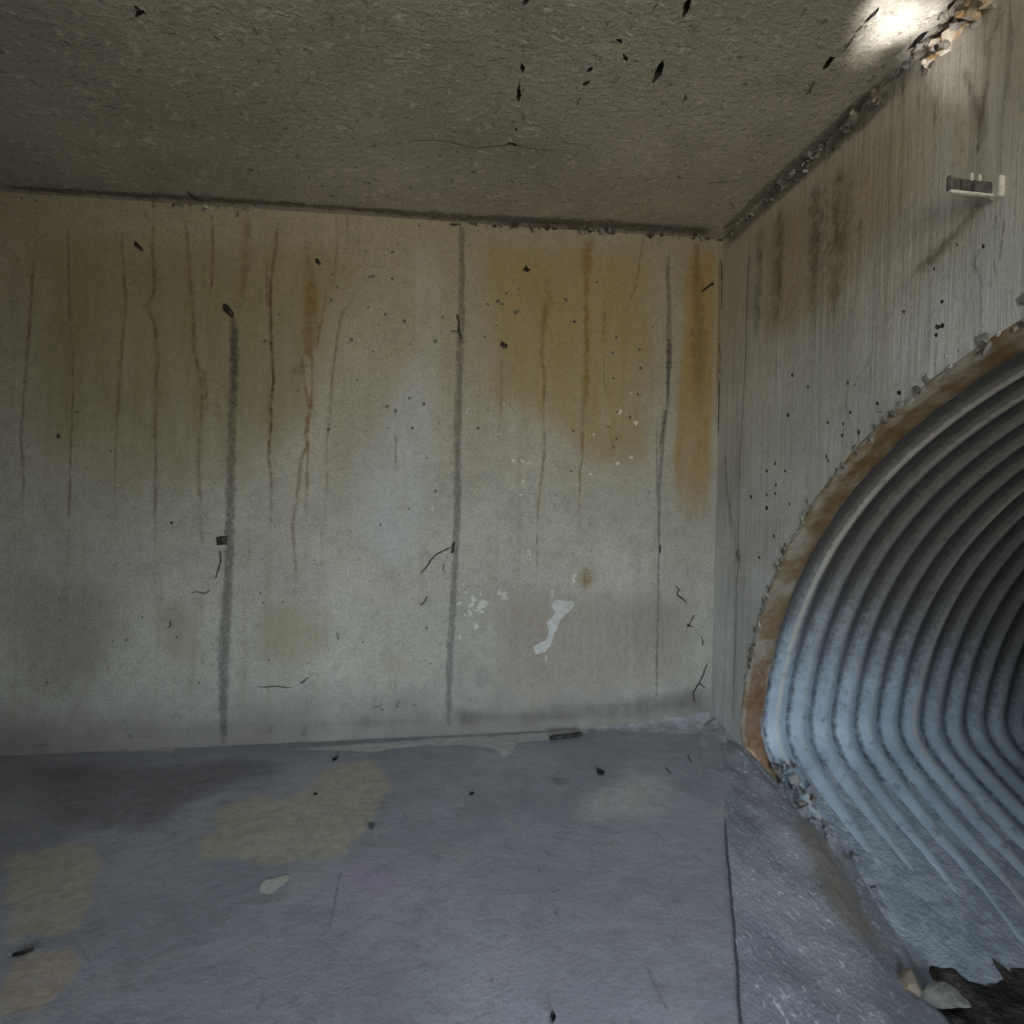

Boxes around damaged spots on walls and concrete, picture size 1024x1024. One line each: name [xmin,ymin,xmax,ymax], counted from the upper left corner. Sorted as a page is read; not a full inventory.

spalling [678,0,996,241]
water stain [0,202,457,683]
corrosion [463,222,721,526]
crack [422,542,455,572]
peeling [533,590,575,663]
crack [676,586,707,702]
spalling [771,761,888,909]